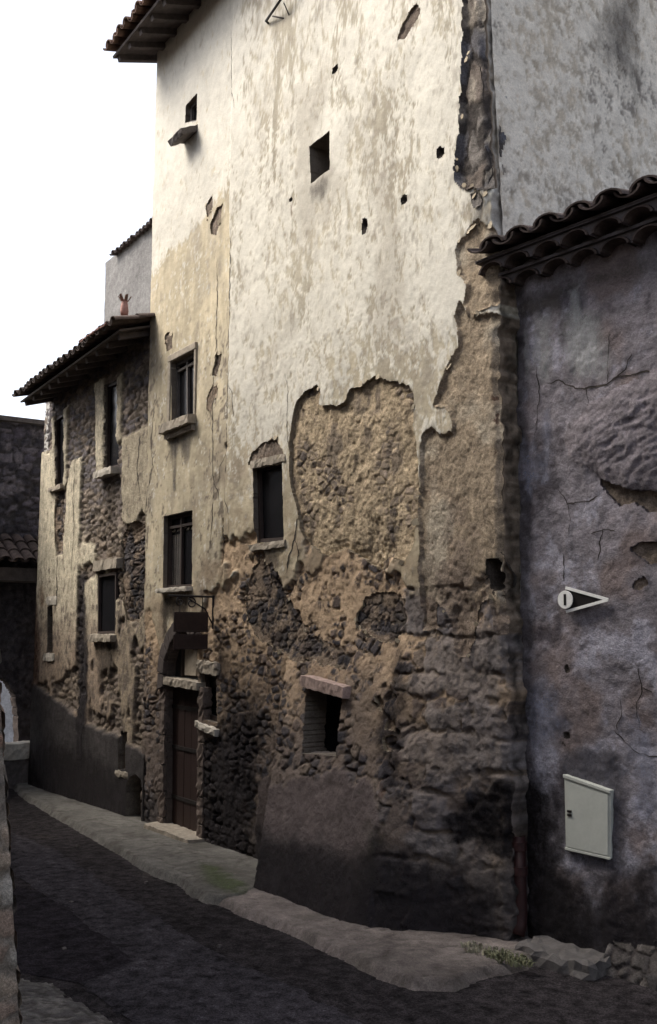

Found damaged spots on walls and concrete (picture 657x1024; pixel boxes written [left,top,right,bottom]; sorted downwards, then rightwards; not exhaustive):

spalling [206,198,223,235]
spalling [245,0,510,670]
spalling [207,350,222,413]
crack [534,335,649,435]
spalling [55,490,65,553]
spalling [123,521,146,622]
spalling [602,479,657,512]
spalling [632,541,657,564]
crack [614,670,657,757]
damp [203,709,495,937]